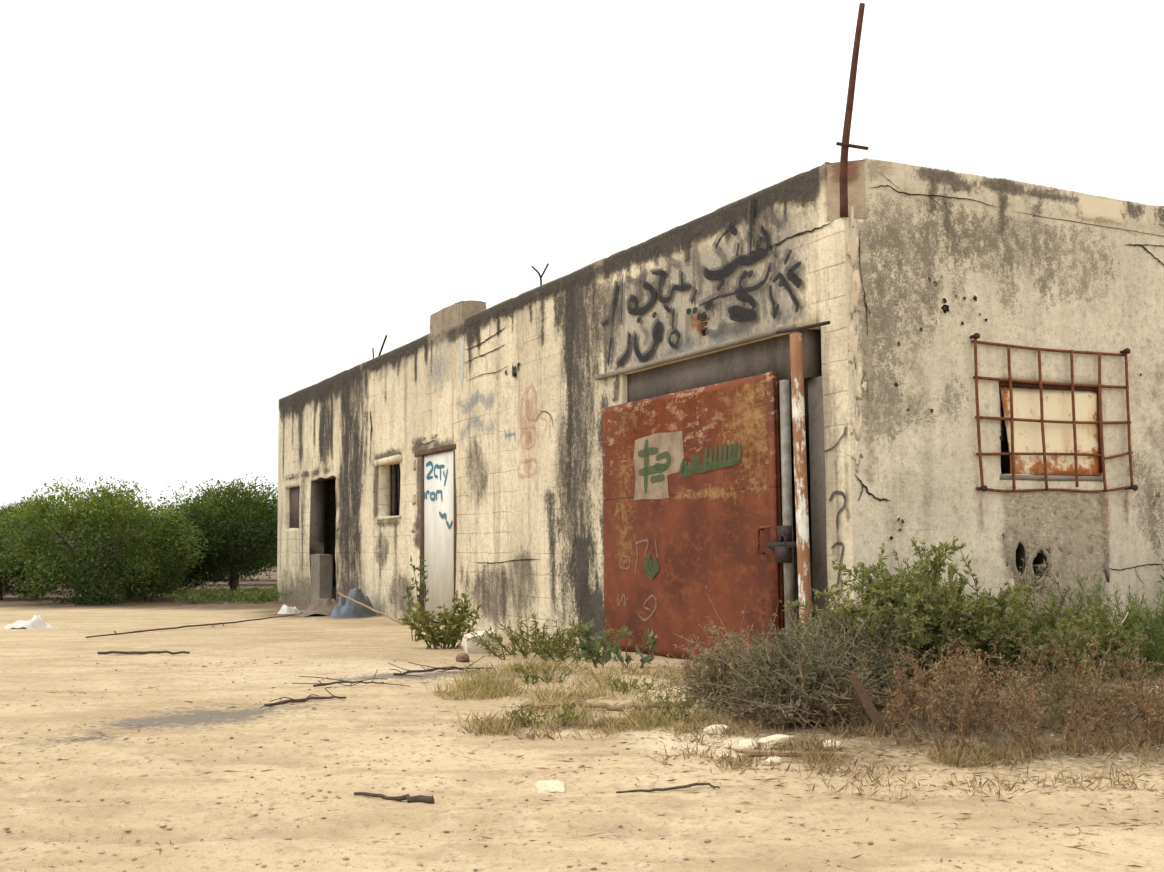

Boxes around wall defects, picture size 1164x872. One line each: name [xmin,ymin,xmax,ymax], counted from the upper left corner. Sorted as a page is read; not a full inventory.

crack [873,174,1164,265]
leakage [1126,201,1164,222]
leakage [279,335,432,595]
crack [465,326,508,381]
leakage [447,166,821,647]
corrosion [615,381,769,562]
crack [855,474,890,501]
leakage [855,167,1120,451]
spalling [1000,488,1110,634]